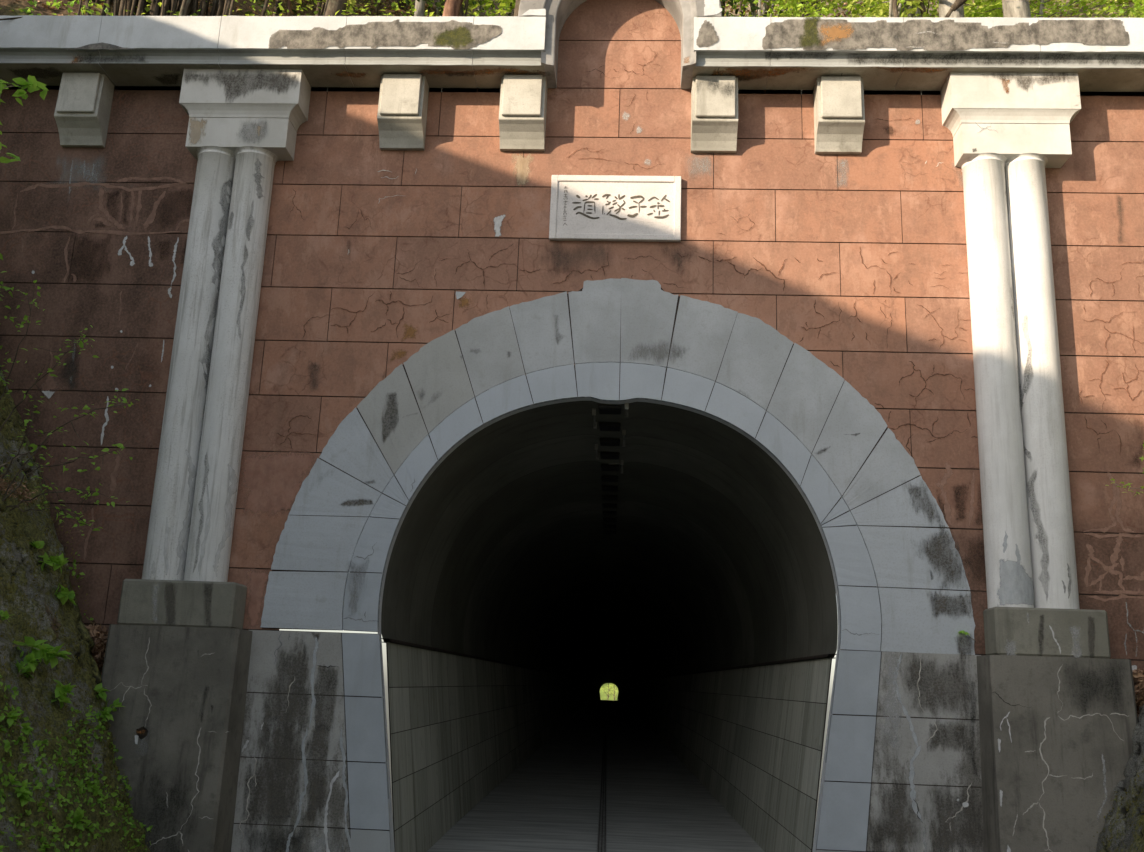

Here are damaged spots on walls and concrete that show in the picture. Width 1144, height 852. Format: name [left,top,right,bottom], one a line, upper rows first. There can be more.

peeling [269,19,502,49]
peeling [762,16,1130,59]
crack [0,176,190,283]
water stain [148,236,187,298]
water stain [382,393,397,440]
crack [303,215,978,526]
crack [1079,262,1144,602]
water stain [909,486,986,617]
water stain [242,637,340,852]
water stain [869,637,983,852]
crack [947,783,972,830]
crack [992,625,1126,852]